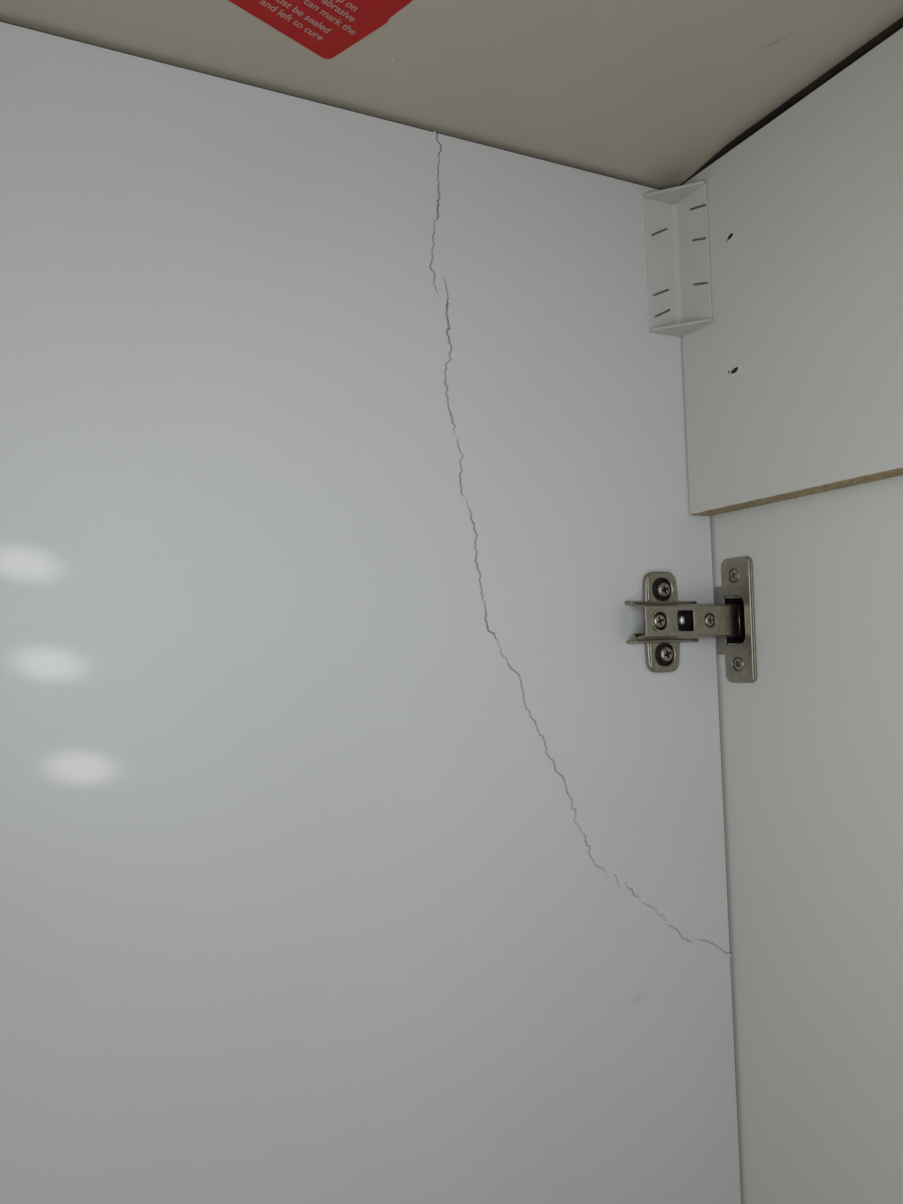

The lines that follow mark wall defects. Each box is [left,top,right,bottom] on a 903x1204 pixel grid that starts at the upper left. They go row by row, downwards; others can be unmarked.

crack [427,131,732,956]